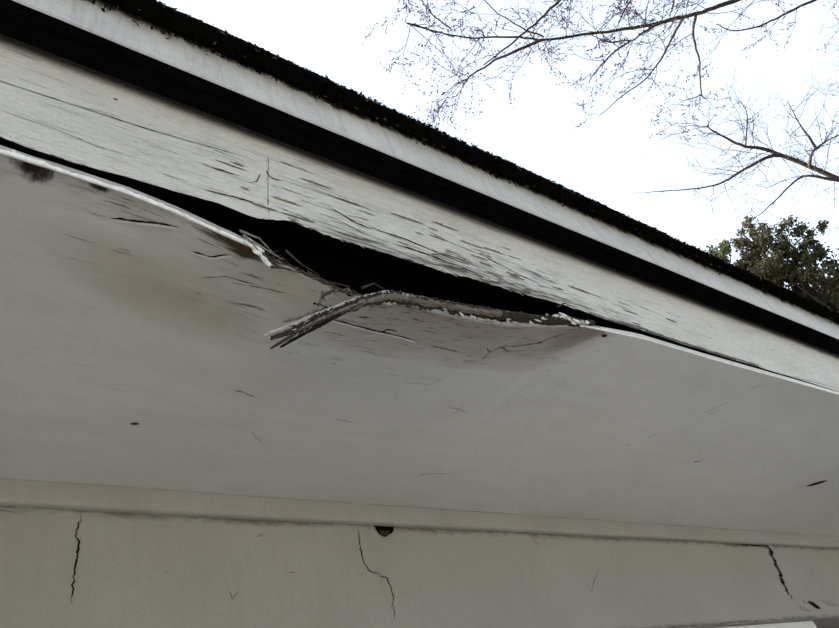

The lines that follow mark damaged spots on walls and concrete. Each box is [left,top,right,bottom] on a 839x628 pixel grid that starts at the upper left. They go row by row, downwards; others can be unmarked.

spalling [242,234,272,267]
peeling [252,196,315,227]
peeling [323,212,618,327]
crack [70,515,86,604]
crack [357,528,396,620]
crack [738,544,797,599]